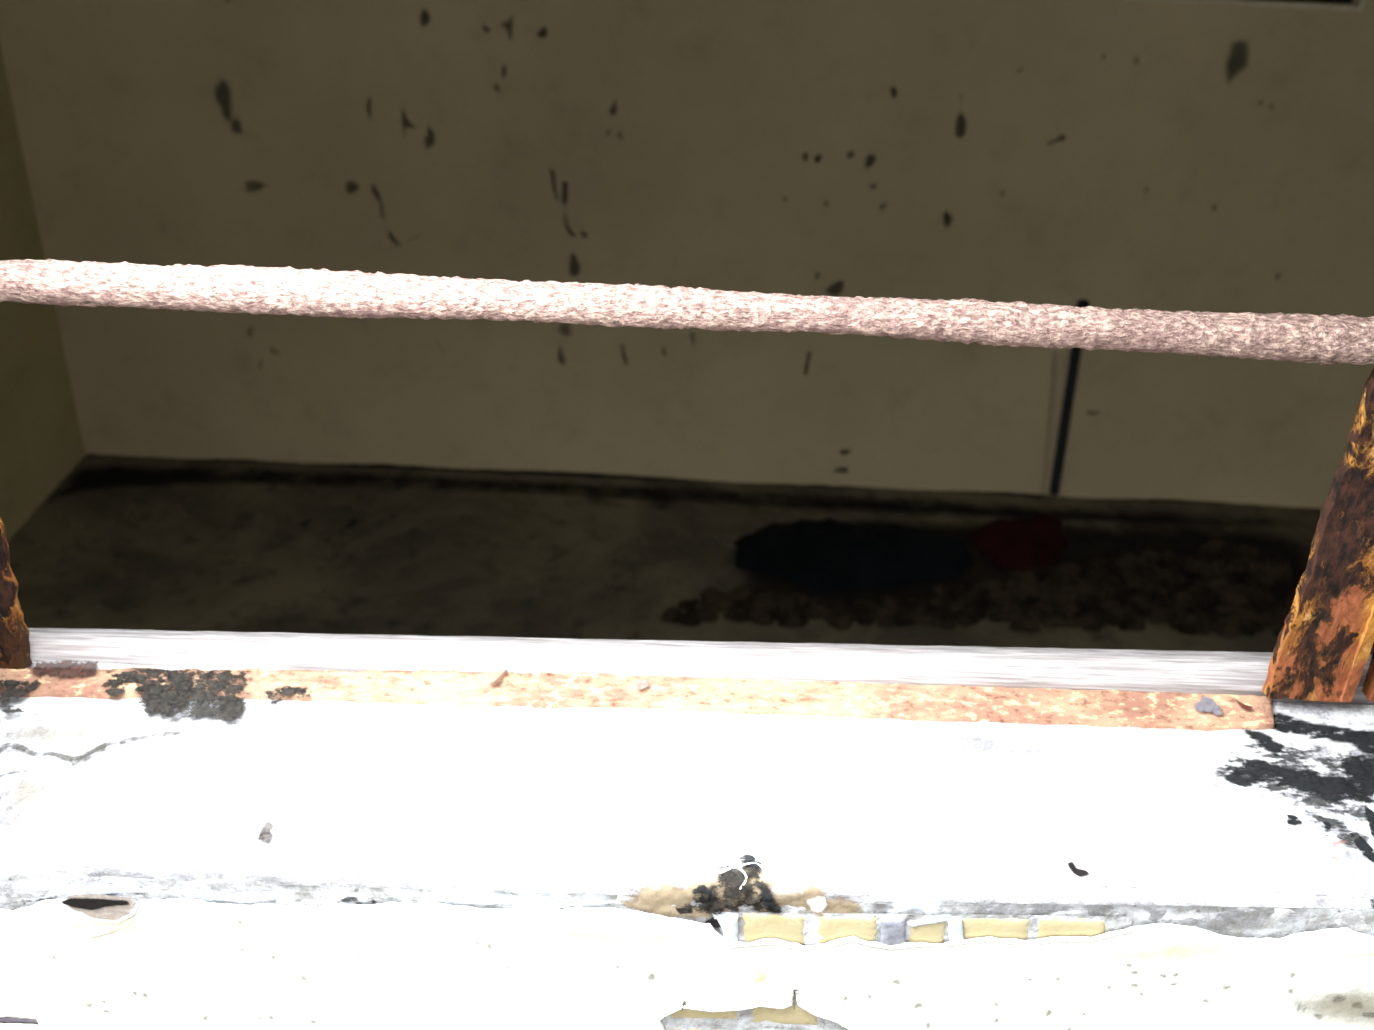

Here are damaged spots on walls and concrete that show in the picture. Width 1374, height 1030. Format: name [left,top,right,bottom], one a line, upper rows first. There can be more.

rust [1194,697,1222,715]
crack [0,730,182,776]
leakage [1216,712,1374,862]
spalling [62,894,140,924]
peeling [624,854,1134,951]
peeling [657,990,851,1030]